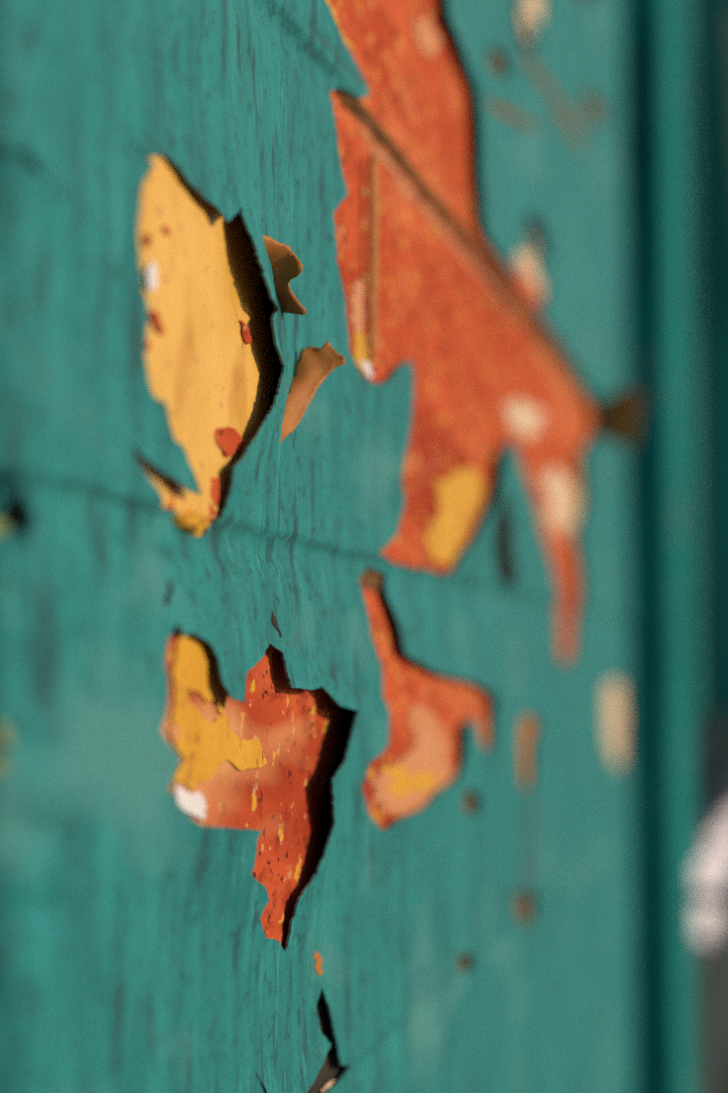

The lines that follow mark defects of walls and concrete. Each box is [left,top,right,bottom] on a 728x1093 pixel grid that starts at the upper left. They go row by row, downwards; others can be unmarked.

peeling [131,0,645,667]
peeling [161,613,359,952]
peeling [359,566,497,831]
peeling [519,714,539,789]
peeling [605,679,627,770]
crack [307,951,351,1093]